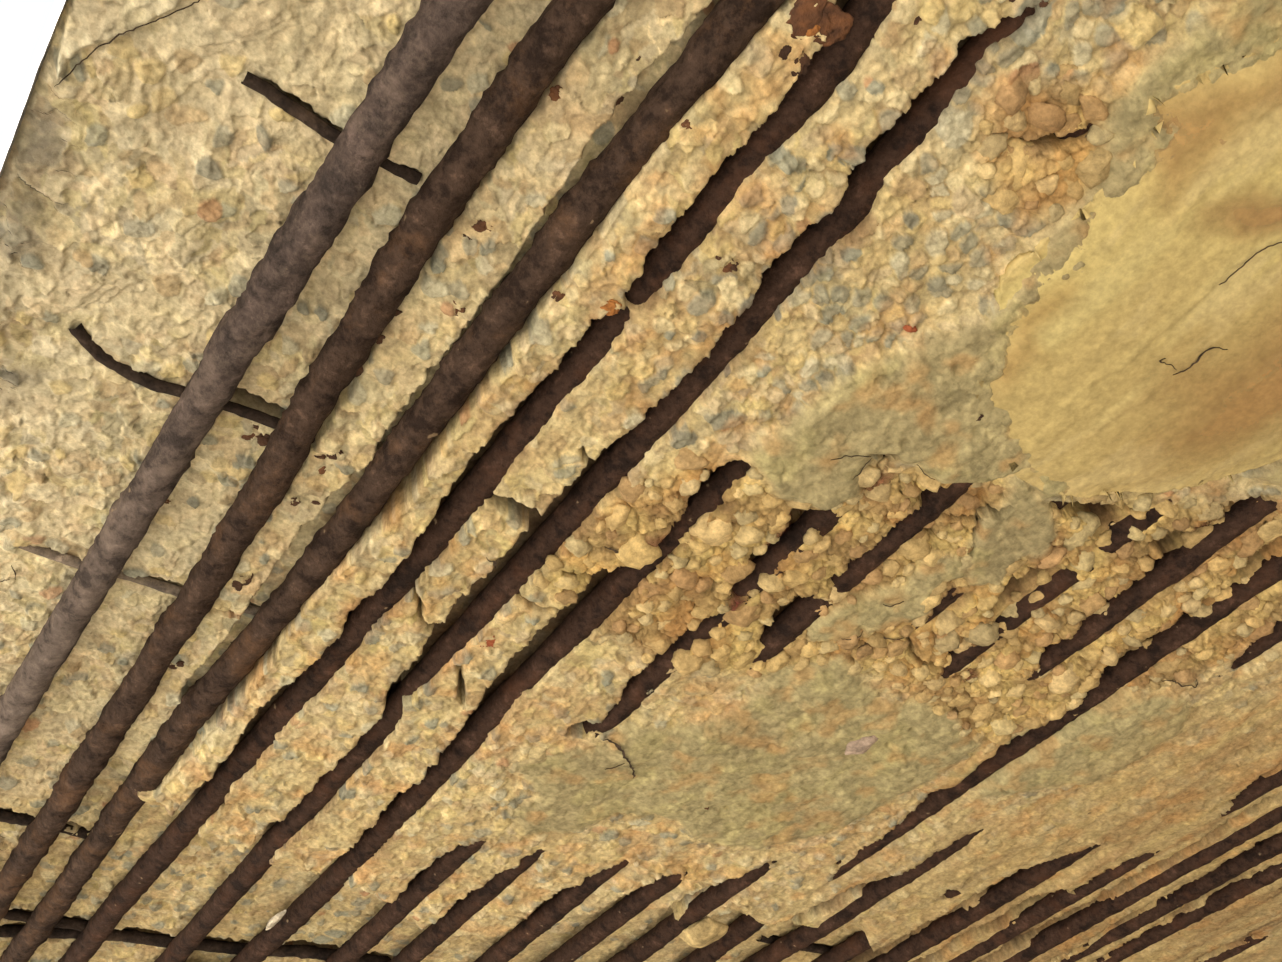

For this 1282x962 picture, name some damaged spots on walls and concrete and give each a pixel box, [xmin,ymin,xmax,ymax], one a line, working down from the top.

corrosion [779,0,854,77]
corrosion [463,220,492,240]
corrosion [715,256,739,273]
corrosion [241,422,270,446]
spalling [137,0,1209,853]
corrosion [314,450,344,475]
spalling [0,0,719,957]
spalling [1032,458,1282,507]
corrosion [232,573,253,591]
spalling [263,626,1282,962]
spalling [28,938,76,962]
spalling [88,941,166,962]